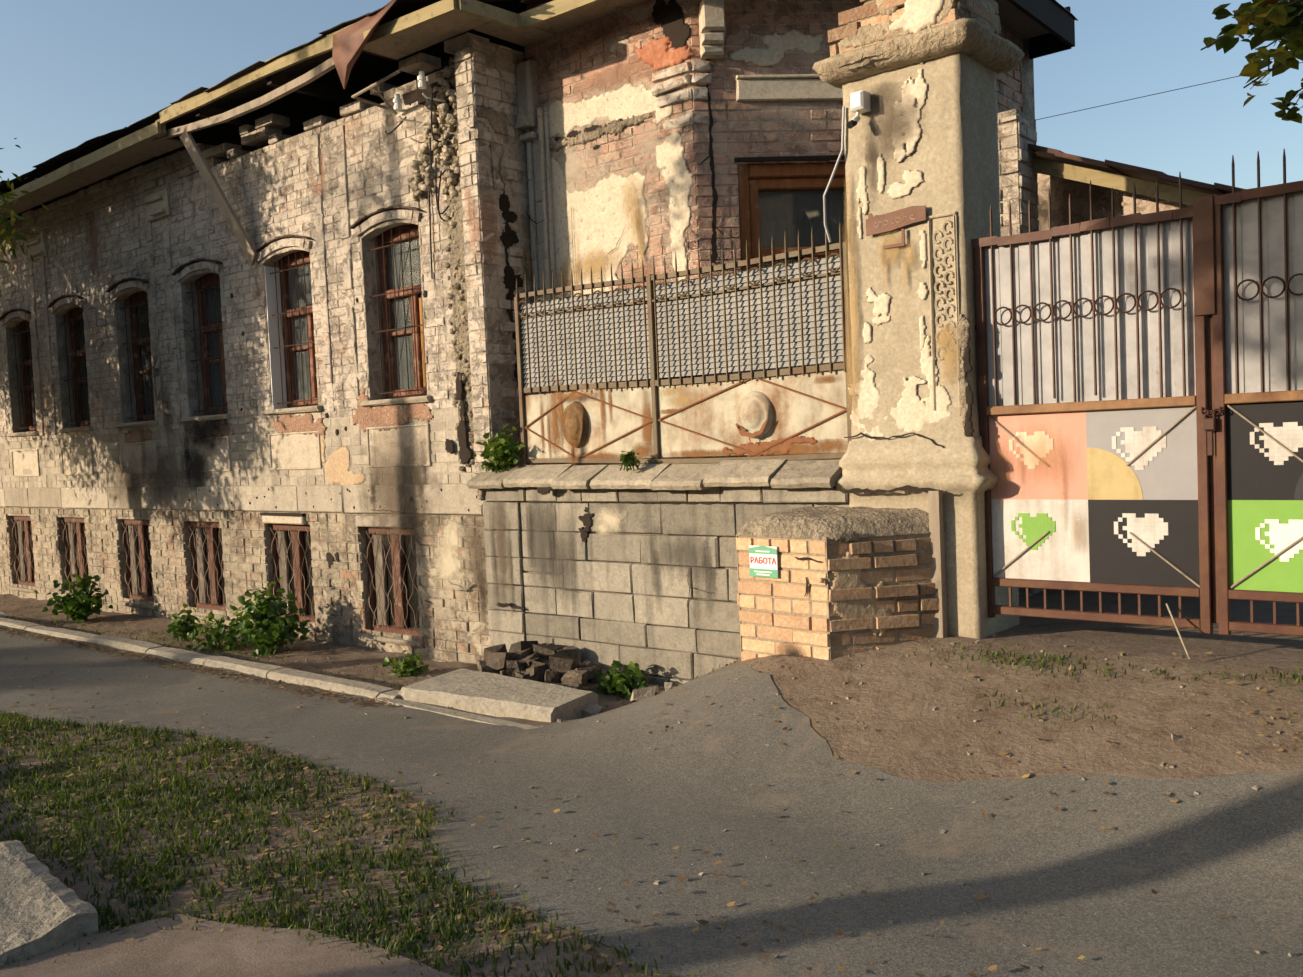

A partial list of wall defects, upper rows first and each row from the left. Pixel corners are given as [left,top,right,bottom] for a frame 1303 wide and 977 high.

spalling [838,0,956,49]
spalling [554,118,623,150]
flaking render [856,61,928,239]
flaking render [918,230,928,300]
flaking render [848,287,974,440]
peeling [271,412,381,509]
spalling [352,388,433,432]
rust [540,389,690,463]
rust [764,439,843,455]